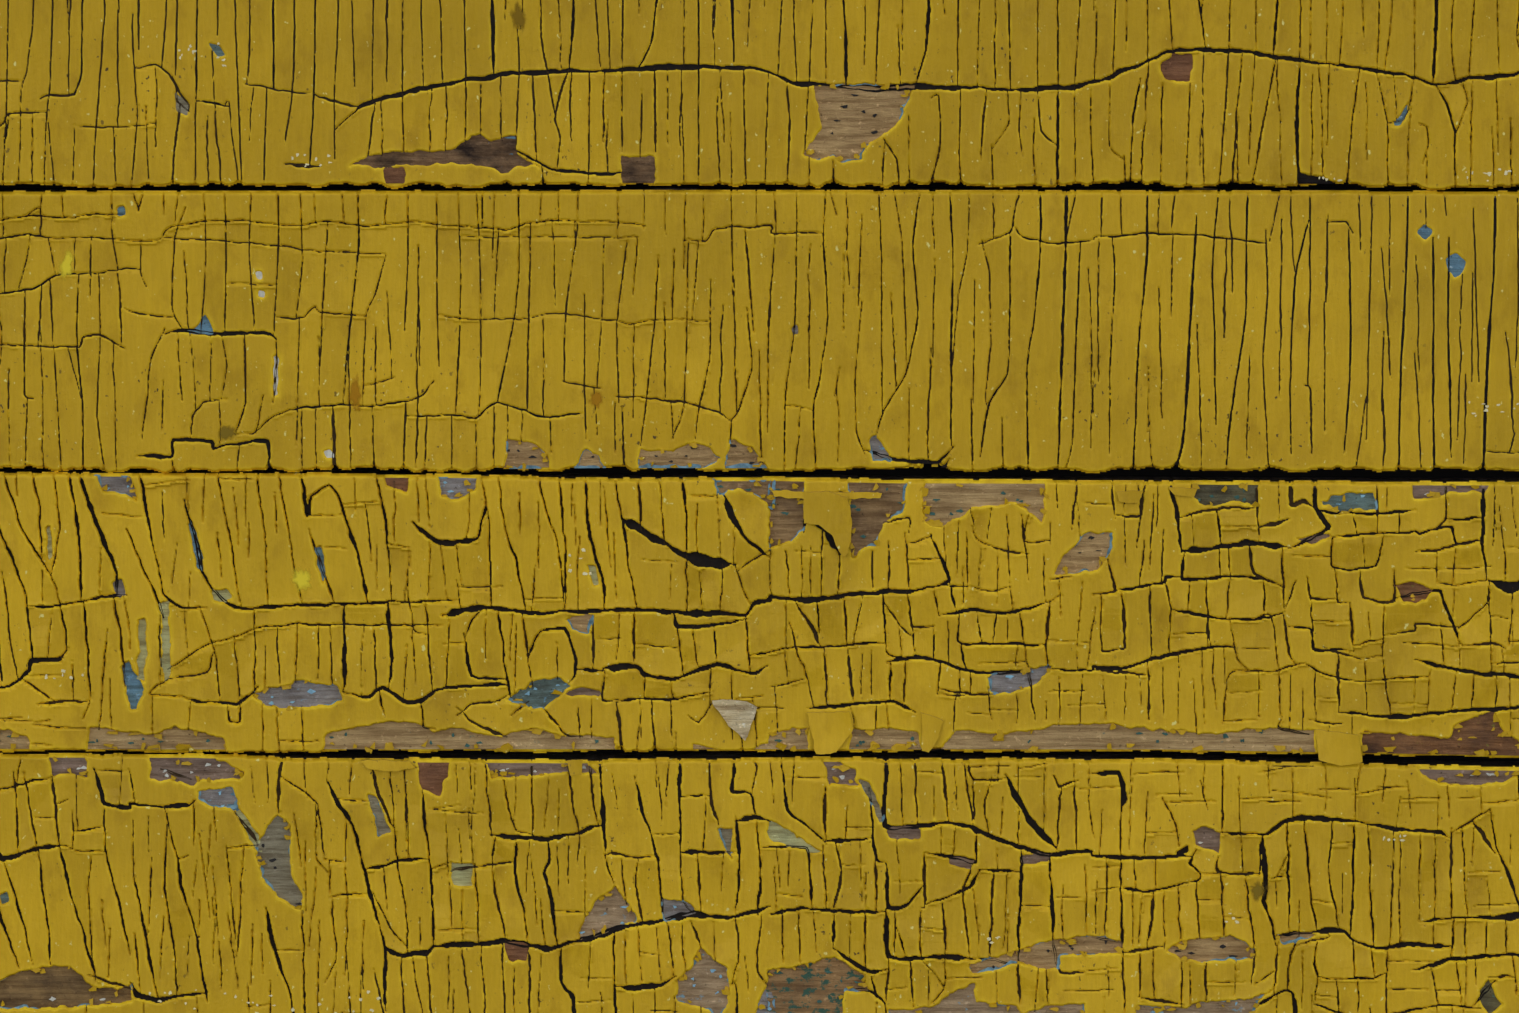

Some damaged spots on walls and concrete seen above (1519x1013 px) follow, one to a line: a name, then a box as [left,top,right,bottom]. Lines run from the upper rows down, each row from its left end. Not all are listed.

peeling [352,134,539,183]
peeling [804,82,915,163]
crack [0,0,1519,747]
peeling [870,436,892,462]
peeling [638,440,1049,558]
peeling [122,600,171,709]
peeling [49,726,303,910]
peeling [0,966,133,1009]
peeling [756,957,868,1013]
peeling [888,935,1123,1013]
peeling [1135,994,1264,1013]
peeling [1168,935,1255,962]